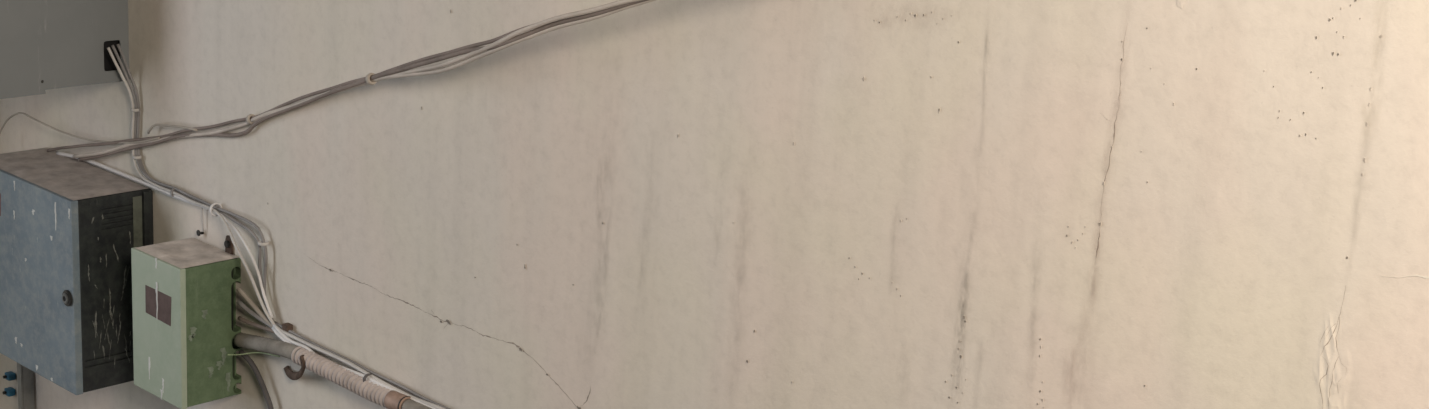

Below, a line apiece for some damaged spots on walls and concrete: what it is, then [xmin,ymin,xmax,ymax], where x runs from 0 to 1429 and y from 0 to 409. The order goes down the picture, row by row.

crack [1096,33,1126,256]
crack [303,253,591,409]